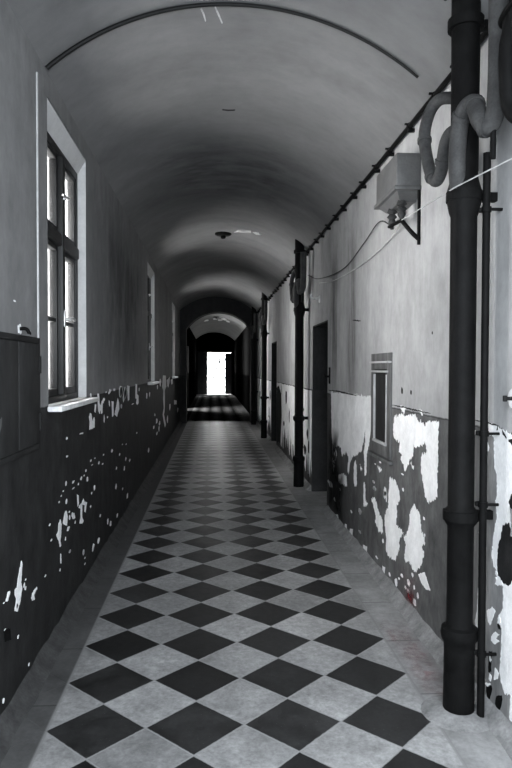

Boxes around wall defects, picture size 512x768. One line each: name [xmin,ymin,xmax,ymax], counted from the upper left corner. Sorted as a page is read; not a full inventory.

peeling [80,376,178,435]
peeling [49,443,130,571]
peeling [331,391,439,606]
peeling [3,561,37,612]
peeling [473,423,512,724]